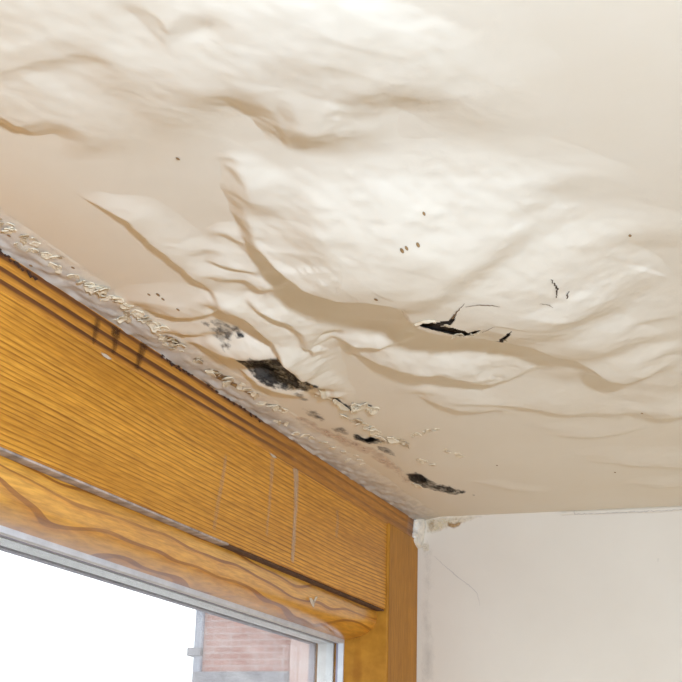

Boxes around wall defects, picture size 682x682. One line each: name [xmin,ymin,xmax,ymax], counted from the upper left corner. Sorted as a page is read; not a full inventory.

water stain [216,323,244,347]
peeling [192,357,288,413]